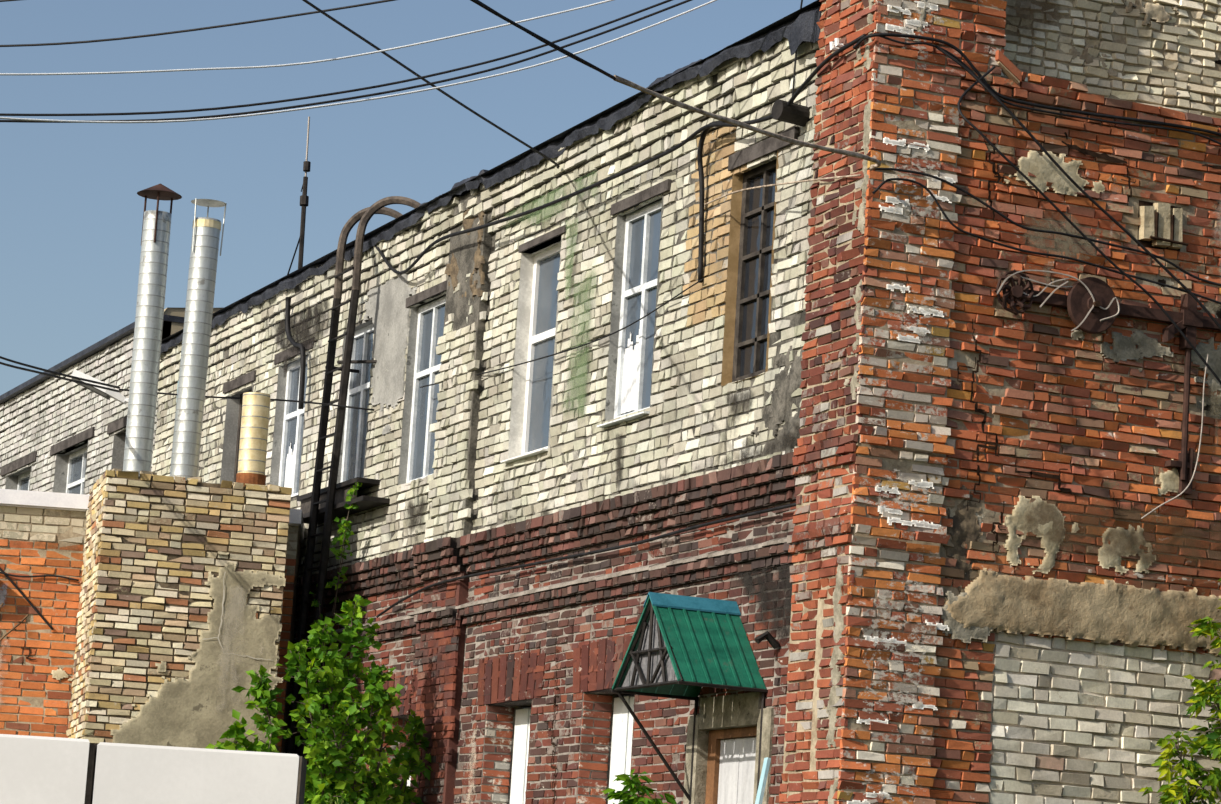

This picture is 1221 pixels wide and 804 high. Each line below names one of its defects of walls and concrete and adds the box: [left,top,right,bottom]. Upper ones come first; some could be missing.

spalling [1068,45,1118,77]
crack [984,135,1004,221]
damp [886,284,944,343]
damp [875,469,941,529]
spalling [940,485,986,593]
damp [857,580,949,725]
damp [847,767,918,804]